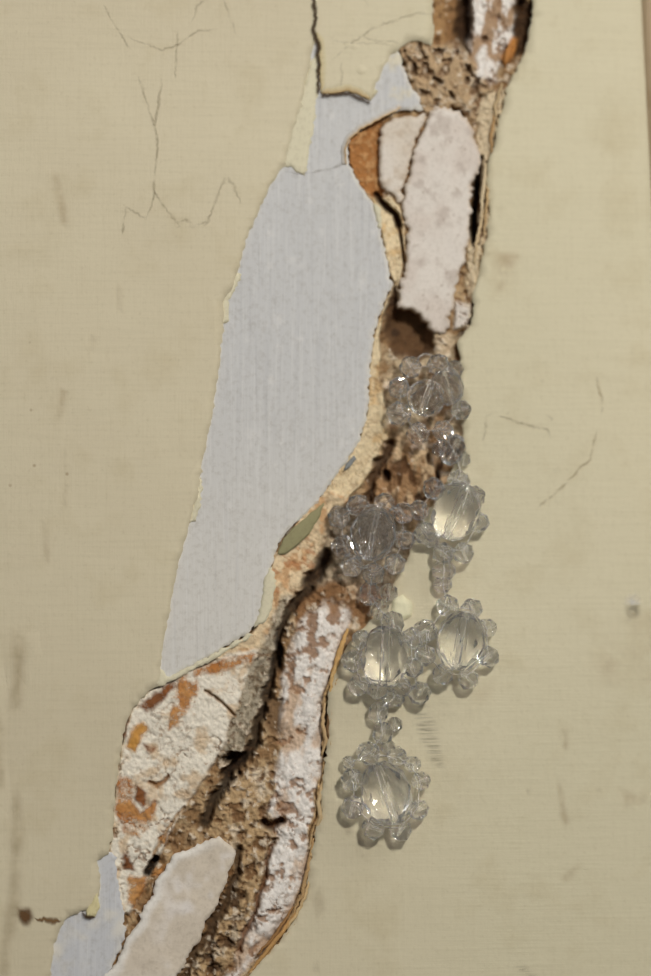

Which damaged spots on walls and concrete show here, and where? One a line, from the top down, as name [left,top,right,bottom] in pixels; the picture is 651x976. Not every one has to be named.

crack [35,916,60,924]
peeling [50,42,426,976]
crack [112,0,533,976]